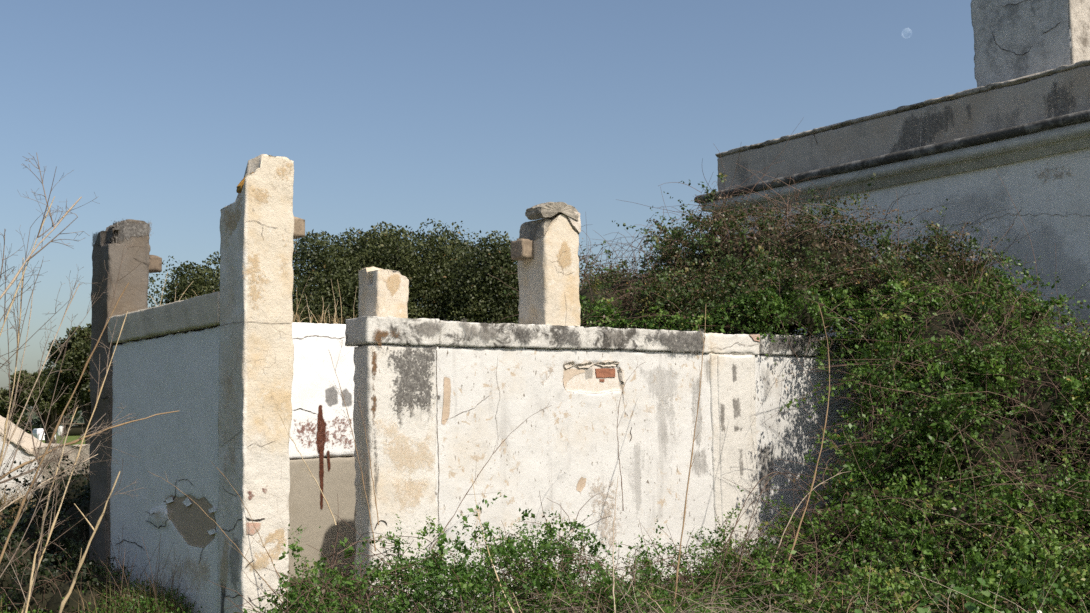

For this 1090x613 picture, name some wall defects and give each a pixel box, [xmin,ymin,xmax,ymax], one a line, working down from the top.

leakage [890,105,954,153]
leakage [462,320,499,341]
leakage [513,325,533,344]
leakage [557,326,581,348]
leakage [646,329,706,355]
leakage [378,322,442,424]
spalling [542,360,625,403]
leakage [721,399,741,432]
rust [316,405,331,509]
leakage [759,445,774,505]
spalling [165,494,216,548]